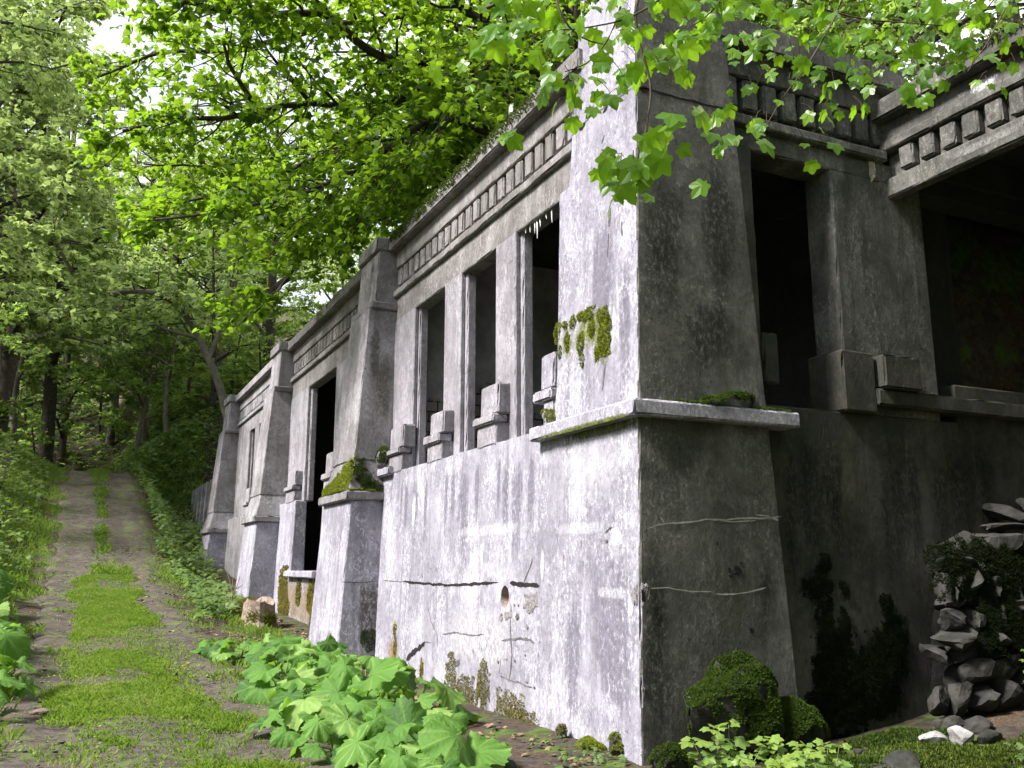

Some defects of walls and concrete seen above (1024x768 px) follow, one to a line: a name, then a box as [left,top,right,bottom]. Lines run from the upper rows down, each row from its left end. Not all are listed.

water stain [400,483,427,525]
water stain [444,472,479,536]
water stain [497,459,534,542]
crack [647,514,781,529]
crack [344,560,539,688]
flaking render [434,592,538,683]
water stain [566,613,580,698]
water stain [596,563,633,703]
crack [649,587,766,595]